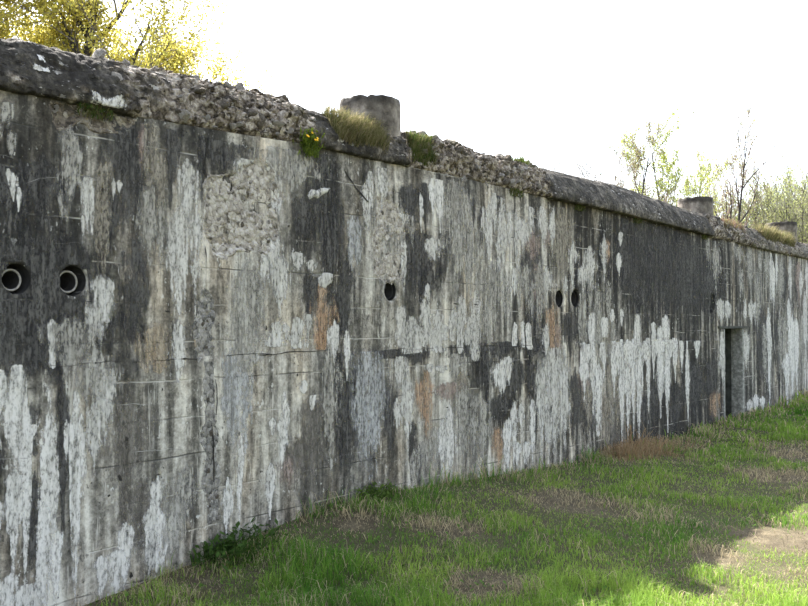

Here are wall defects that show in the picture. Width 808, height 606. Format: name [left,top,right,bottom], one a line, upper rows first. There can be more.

water stain [91,91,124,108]
spalling [192,288,222,525]
spalling [202,158,290,261]
rust [314,284,339,350]
water stain [0,102,731,606]
rust [415,370,470,436]
rust [526,206,576,350]
water stain [734,246,808,411]